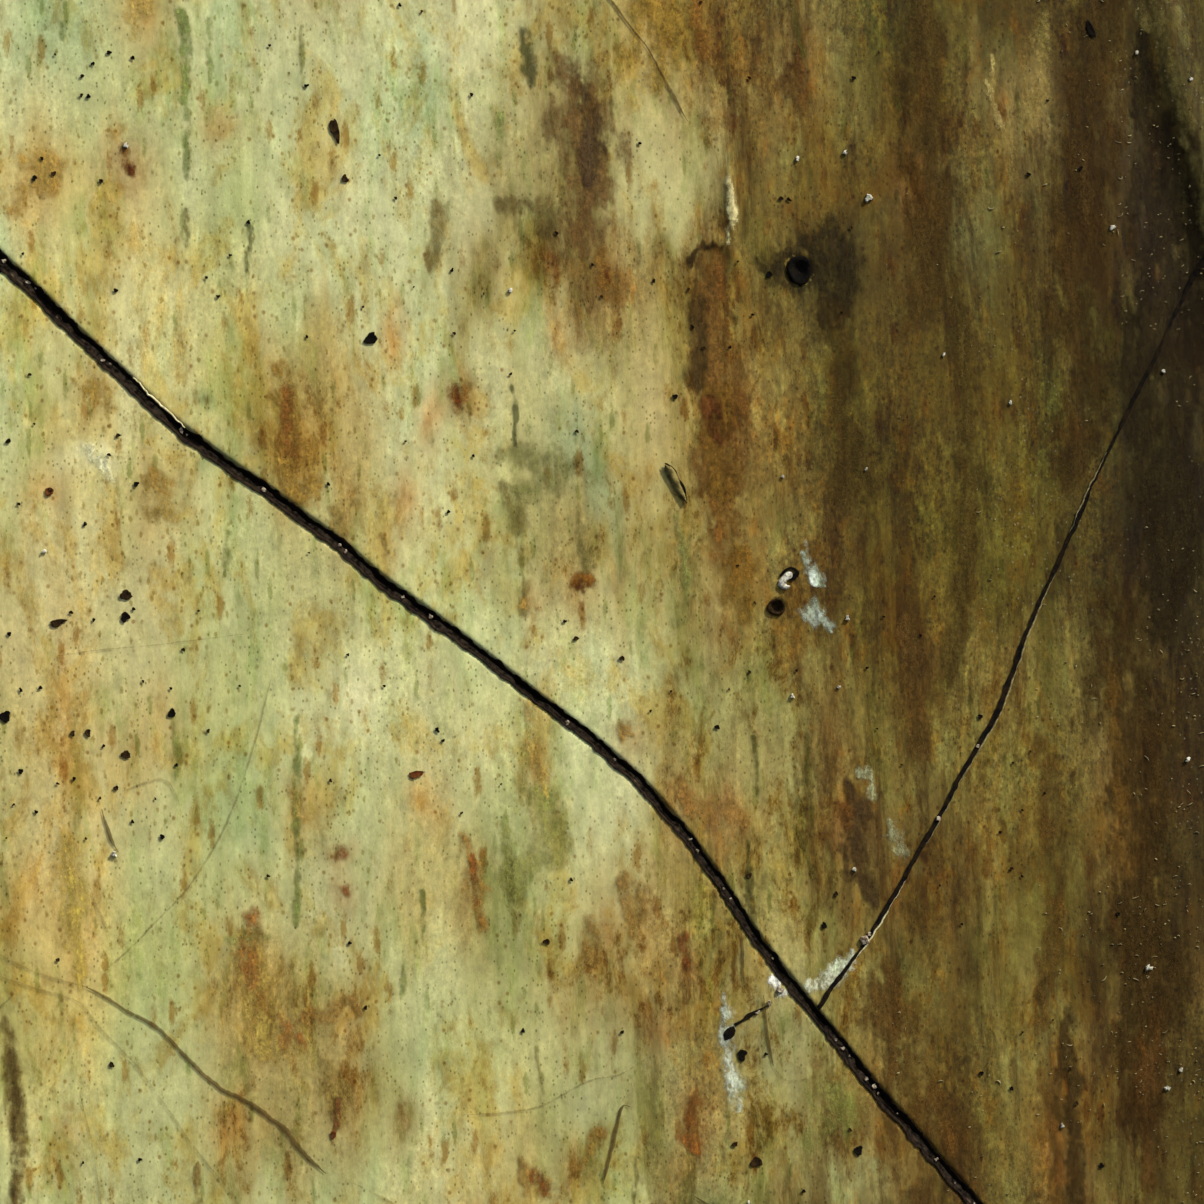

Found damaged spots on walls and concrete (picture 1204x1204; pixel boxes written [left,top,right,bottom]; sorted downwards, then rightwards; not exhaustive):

crack [0,249,1204,1204]
damp [756,213,873,506]
damp [1030,740,1086,1204]
damp [1045,0,1204,1189]